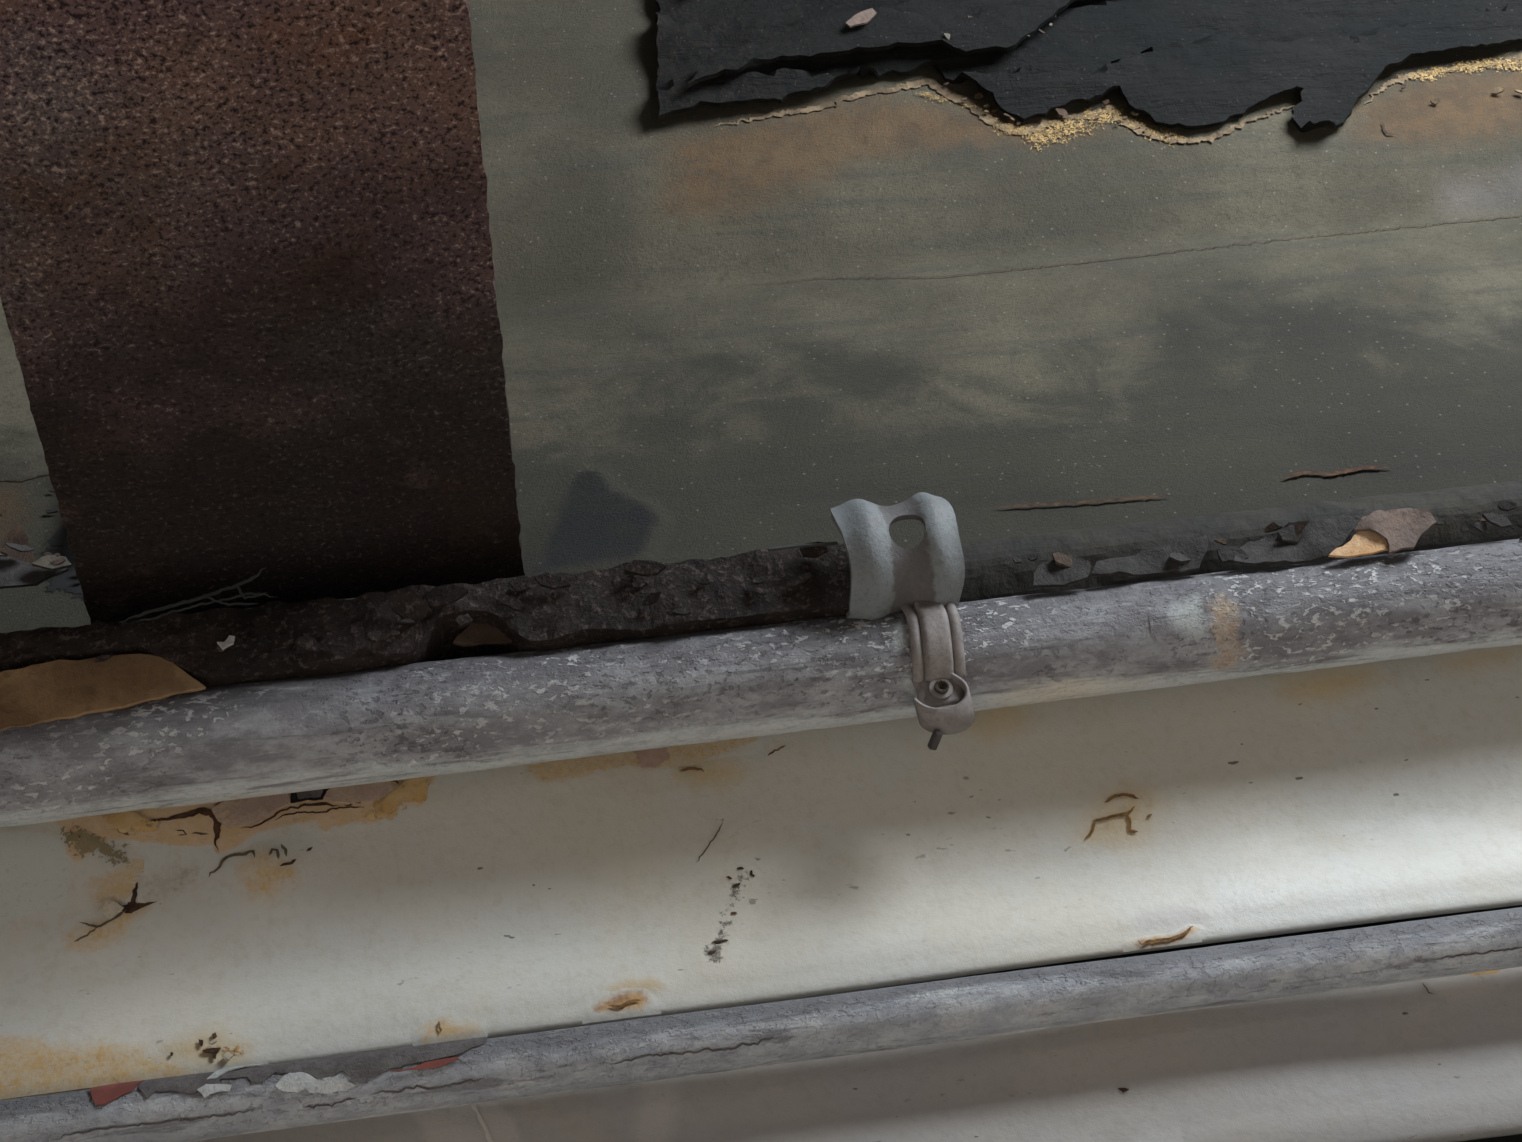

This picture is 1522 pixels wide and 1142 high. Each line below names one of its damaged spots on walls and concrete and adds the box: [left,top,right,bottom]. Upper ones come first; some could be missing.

peeling [846,8,877,28]
peeling [1028,508,1437,588]
peeling [1473,501,1522,541]
peeling [0,654,206,731]
peeling [40,774,453,871]
corrosion [1046,757,1193,872]
crack [209,837,317,915]
corrosion [576,967,678,1024]
peeling [1410,967,1522,1012]
corrosion [0,1013,272,1100]